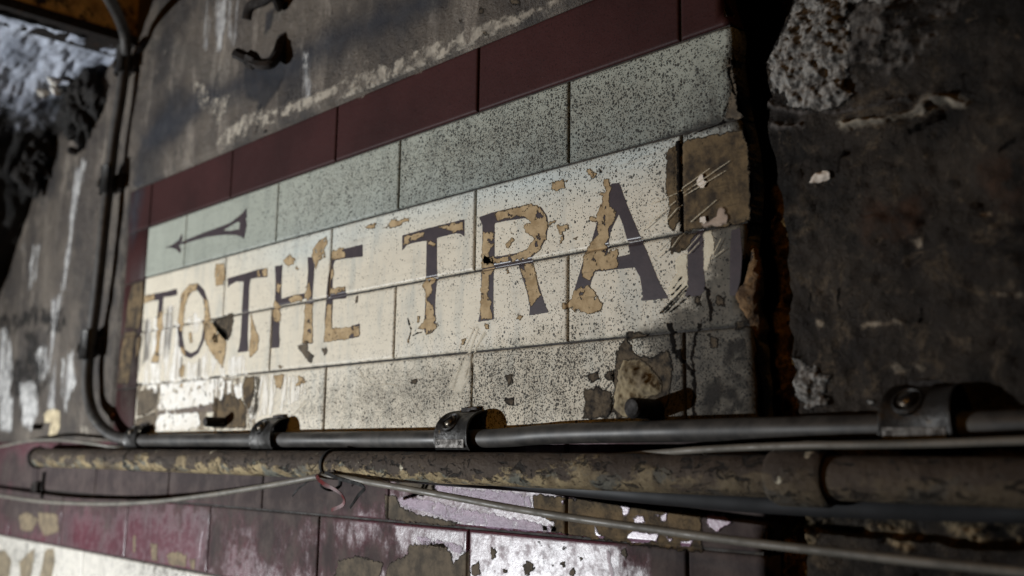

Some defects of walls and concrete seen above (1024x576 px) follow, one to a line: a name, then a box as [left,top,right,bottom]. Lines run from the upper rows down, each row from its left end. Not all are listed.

spalling [767,0,964,113]
peeling [665,64,756,255]
crack [674,0,811,454]
spalling [582,331,673,421]
peeling [334,482,731,576]
crack [767,515,811,576]